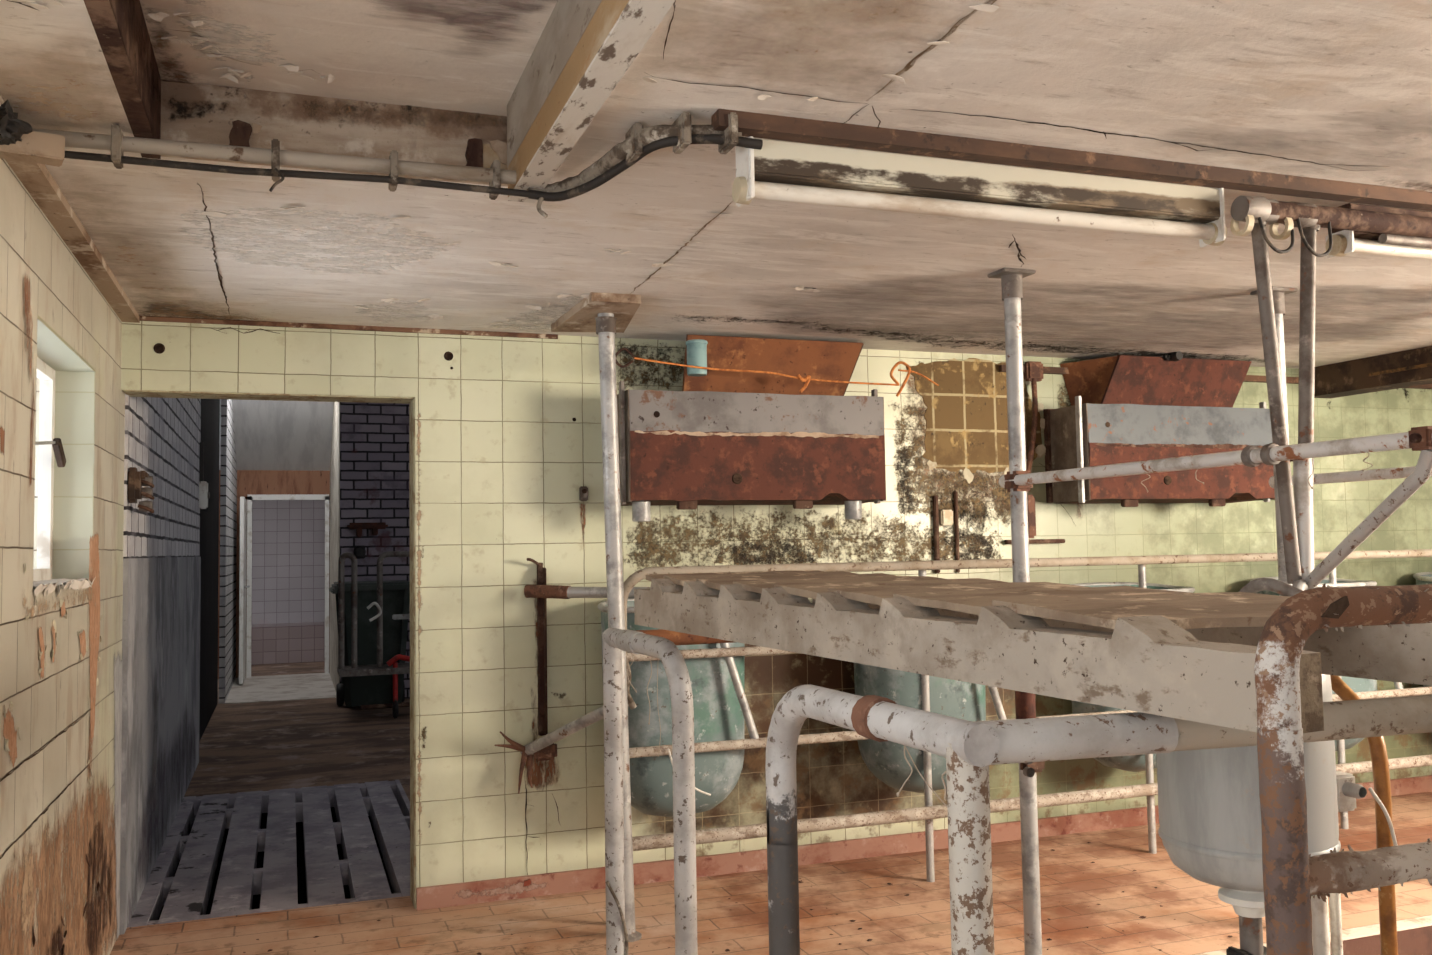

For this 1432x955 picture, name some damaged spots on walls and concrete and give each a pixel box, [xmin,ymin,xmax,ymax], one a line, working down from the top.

leakage [390,0,533,41]
crack [643,0,1390,171]
crack [197,183,280,334]
flaking render [24,563,96,667]
leakage [0,783,117,955]